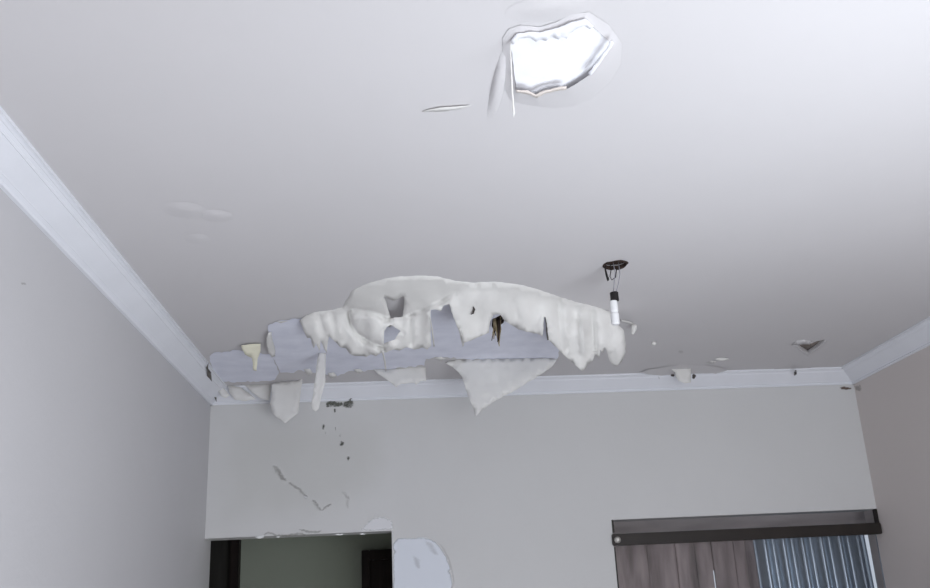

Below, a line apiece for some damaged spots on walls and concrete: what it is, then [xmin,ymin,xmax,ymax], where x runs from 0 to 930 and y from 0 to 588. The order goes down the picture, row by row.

peeling [502,12,622,117]
peeling [210,276,637,423]
peeling [792,340,827,356]
peeling [393,538,452,588]